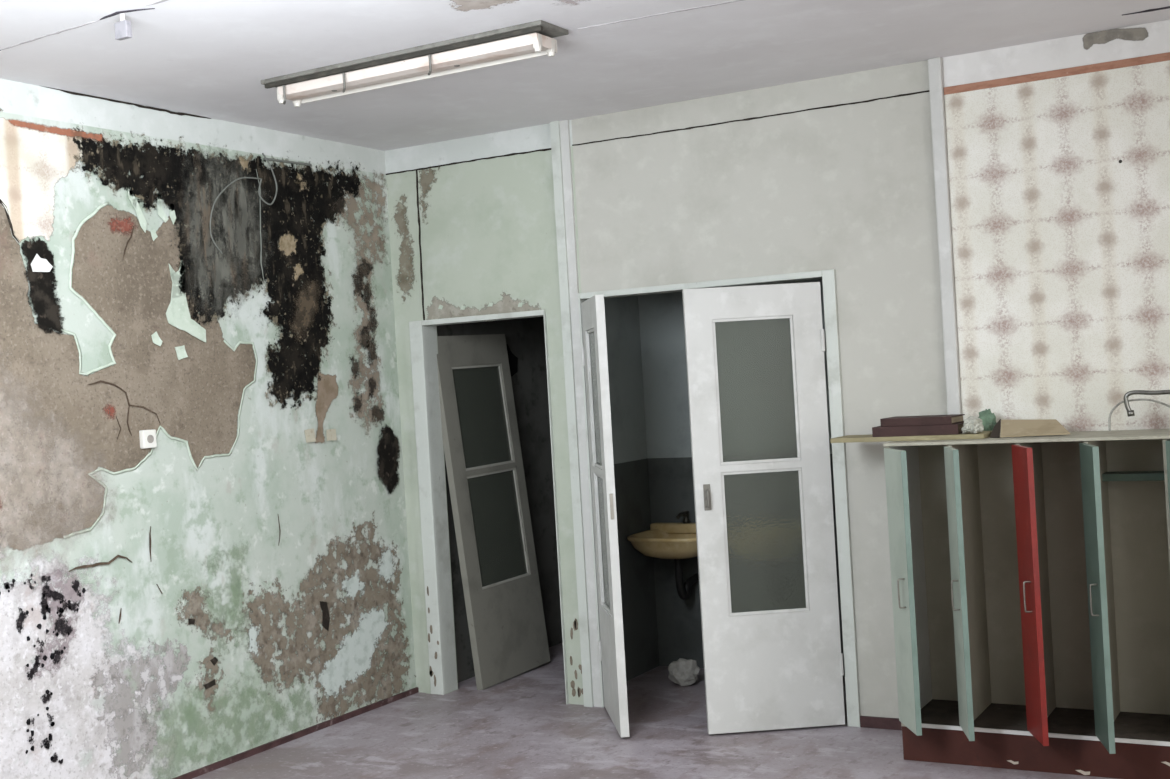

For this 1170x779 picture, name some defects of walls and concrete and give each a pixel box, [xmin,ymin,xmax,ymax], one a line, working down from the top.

flaking render [1083,27,1148,50]
flaking render [0,187,416,779]
damp [68,128,440,494]
peeling [426,292,541,321]